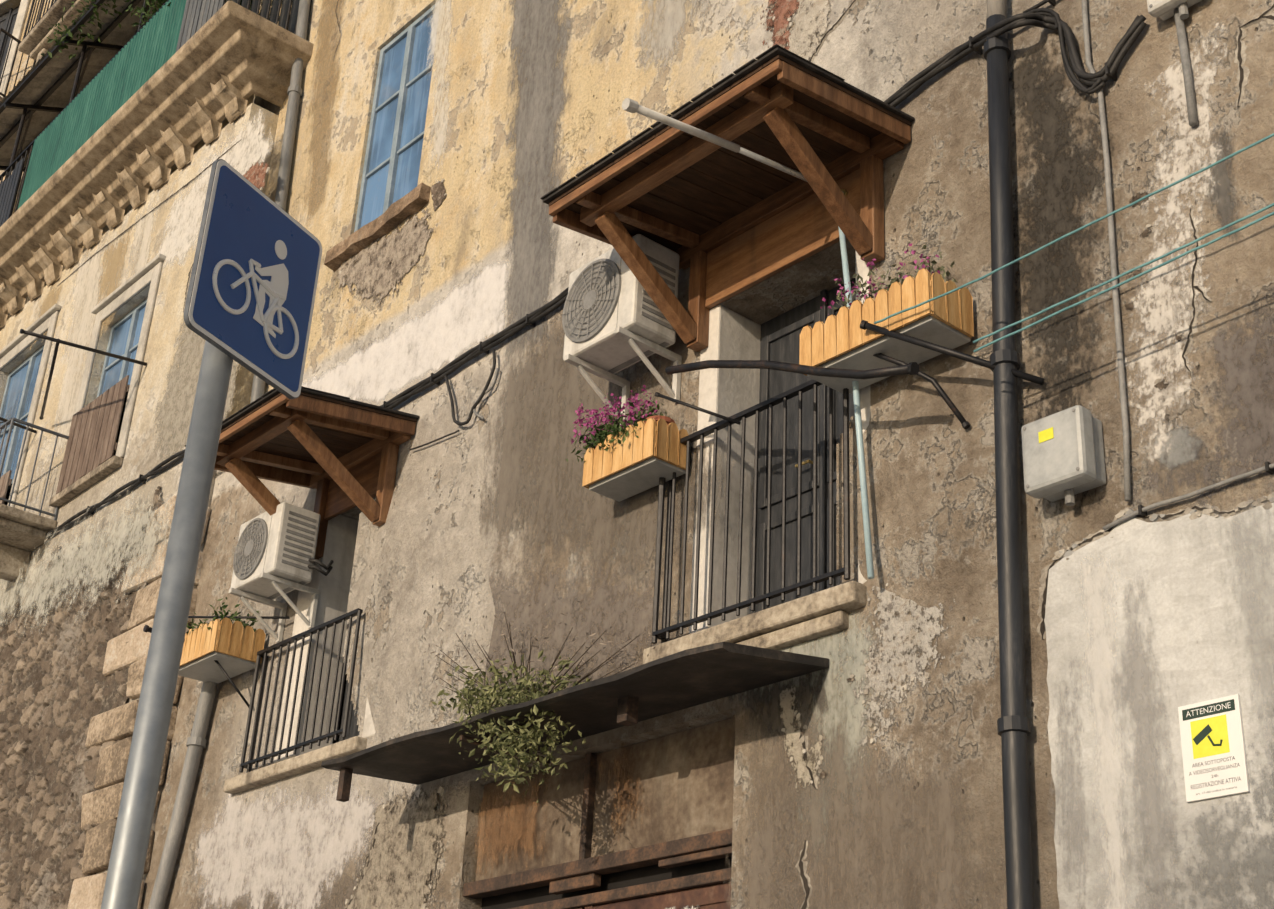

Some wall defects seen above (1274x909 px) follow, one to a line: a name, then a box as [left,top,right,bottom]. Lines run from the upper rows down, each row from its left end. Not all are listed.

spalling [760,0,832,61]
crack [1234,2,1274,106]
spalling [243,160,270,191]
spalling [336,179,447,310]
damp [302,0,722,711]
damp [1009,40,1113,427]
crack [1182,208,1212,377]
spalling [1103,508,1134,538]
crack [1036,496,1270,640]
spalling [1184,492,1274,520]
peeling [779,685,828,792]
peeling [847,583,957,763]